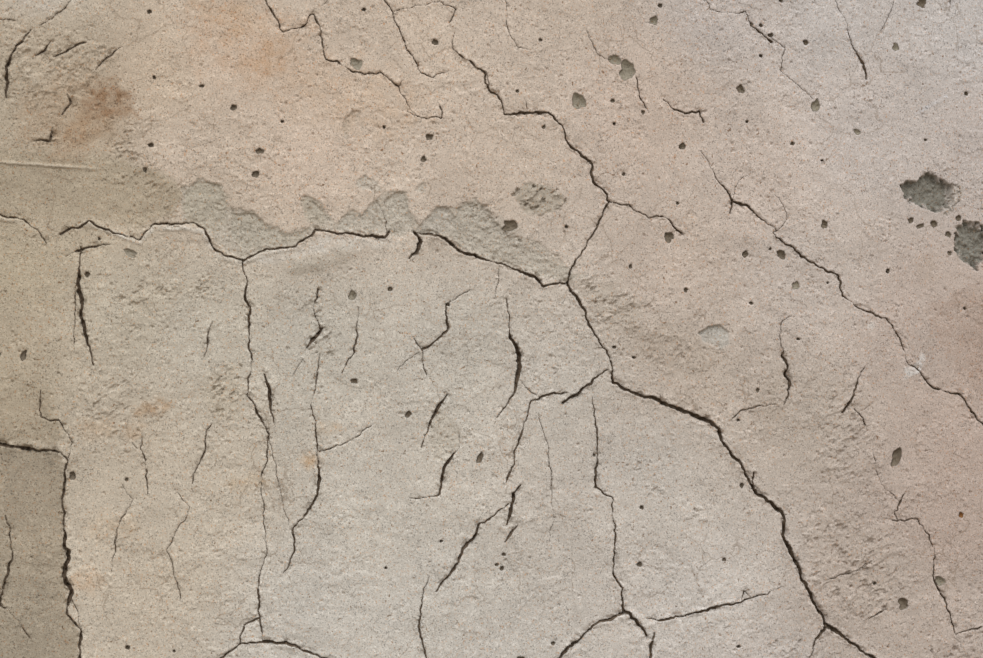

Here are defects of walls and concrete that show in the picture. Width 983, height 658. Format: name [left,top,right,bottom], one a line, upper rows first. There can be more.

crack [0,0,71,98]
crack [0,211,389,658]
crack [265,0,876,658]
crack [702,153,983,425]
crack [874,457,981,635]
spalling [899,168,983,272]